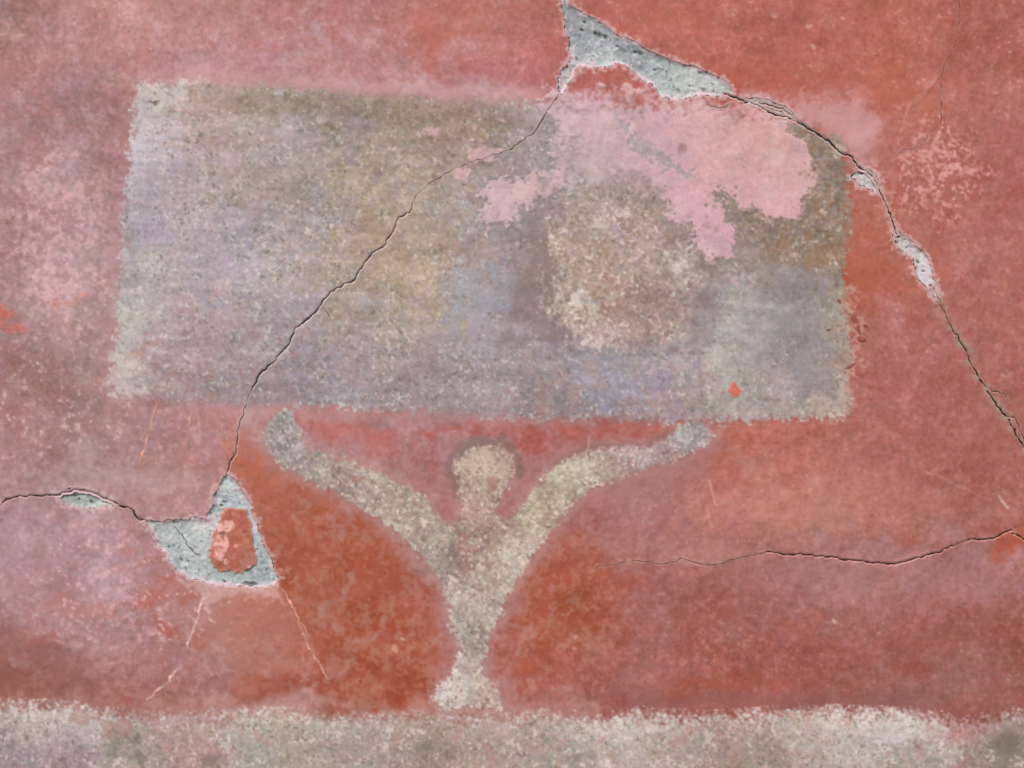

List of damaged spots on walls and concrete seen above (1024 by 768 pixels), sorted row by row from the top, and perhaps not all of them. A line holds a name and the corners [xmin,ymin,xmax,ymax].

peeling [464,0,816,268]
crack [722,0,963,237]
peeling [852,105,1000,235]
crack [224,91,562,475]
spalling [893,233,939,296]
crack [930,285,1024,450]
crack [138,404,158,472]
crack [0,487,146,523]
spalling [143,474,278,588]
crack [590,528,1024,572]